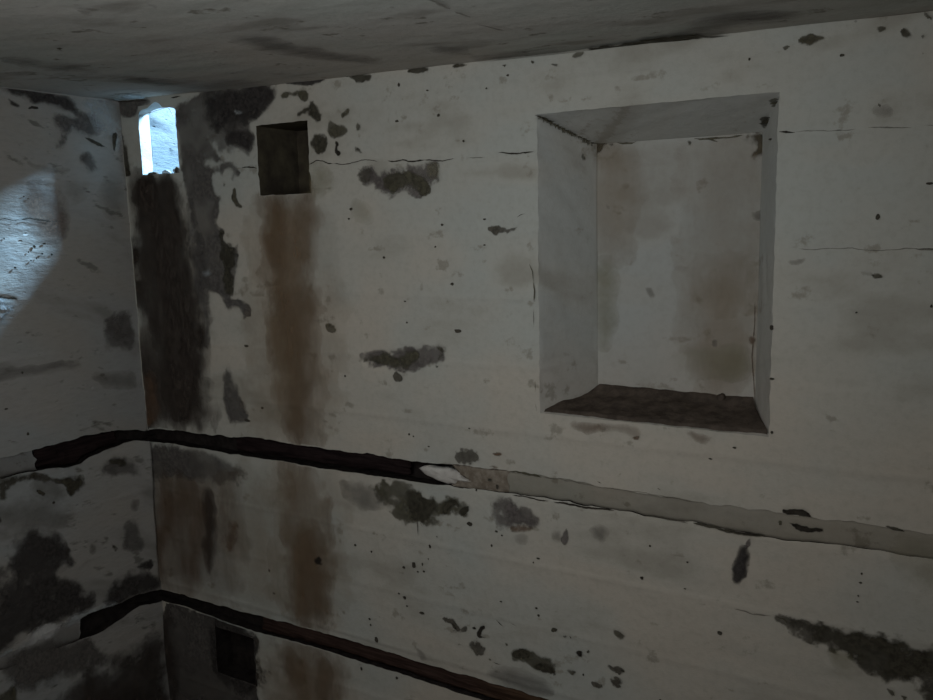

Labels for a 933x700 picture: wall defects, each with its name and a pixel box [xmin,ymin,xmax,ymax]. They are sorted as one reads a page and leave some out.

damp [346,74,371,83]
crack [310,158,450,166]
damp [6,79,360,430]
damp [0,472,84,500]
damp [374,479,469,531]
damp [0,531,262,700]
damp [775,615,933,700]